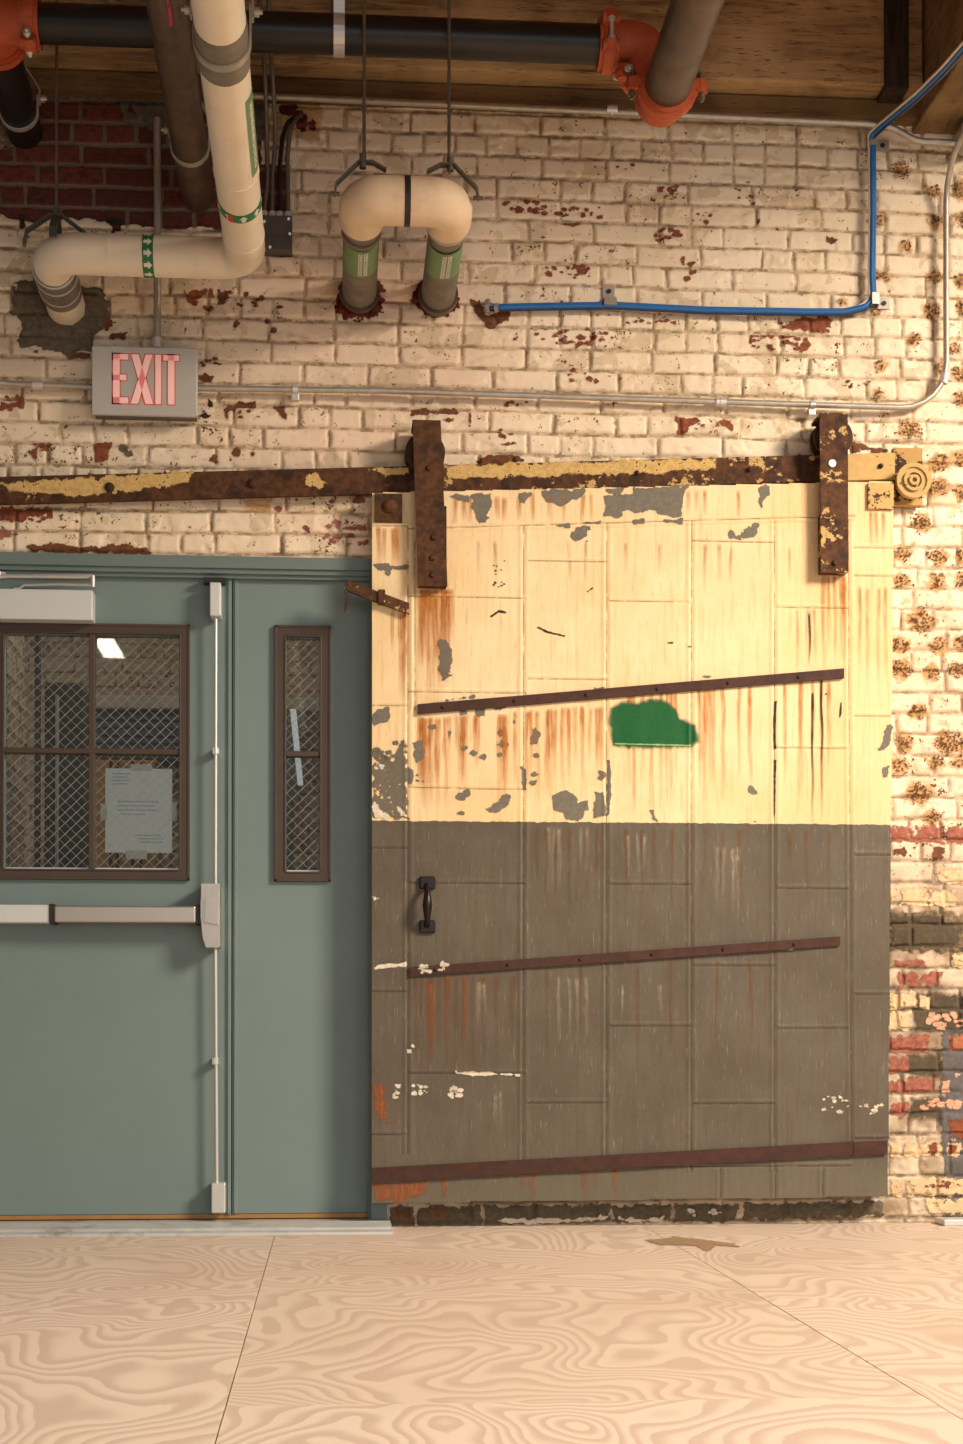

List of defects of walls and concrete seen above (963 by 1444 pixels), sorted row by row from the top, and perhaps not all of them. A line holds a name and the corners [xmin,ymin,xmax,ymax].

corrosion [899,419,923,442]
corrosion [928,451,963,499]
spalling [0,505,153,555]
peeling [556,484,689,542]
corrosion [910,512,932,533]
peeling [371,694,516,820]
corrosion [419,716,477,768]
corrosion [501,707,602,755]
peeling [552,760,612,821]
flaking render [821,953,963,1158]
peeling [890,1176,963,1216]
leakage [499,1214,740,1251]